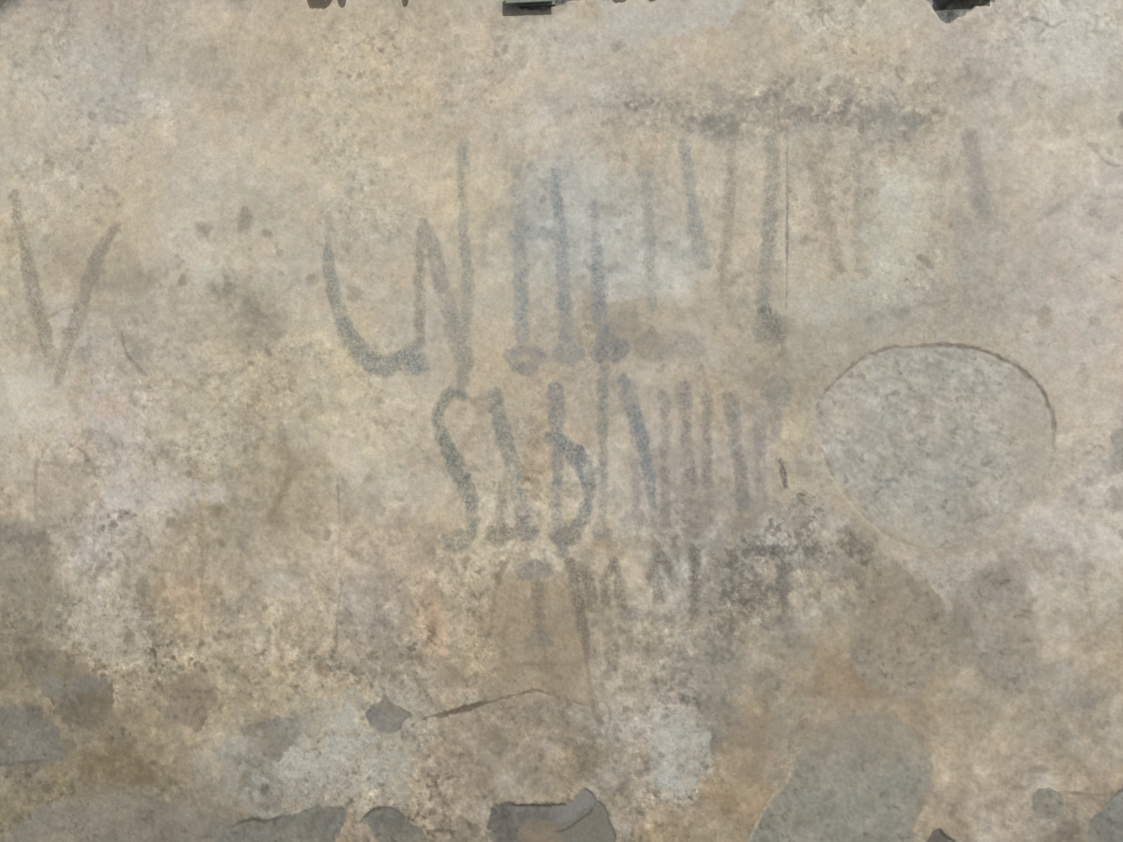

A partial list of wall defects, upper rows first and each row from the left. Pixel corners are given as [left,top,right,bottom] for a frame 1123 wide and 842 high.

flaking render [927,0,995,24]
crack [410,688,612,742]
spalling [484,788,616,842]
spalling [926,828,956,842]
spalling [1086,787,1123,842]